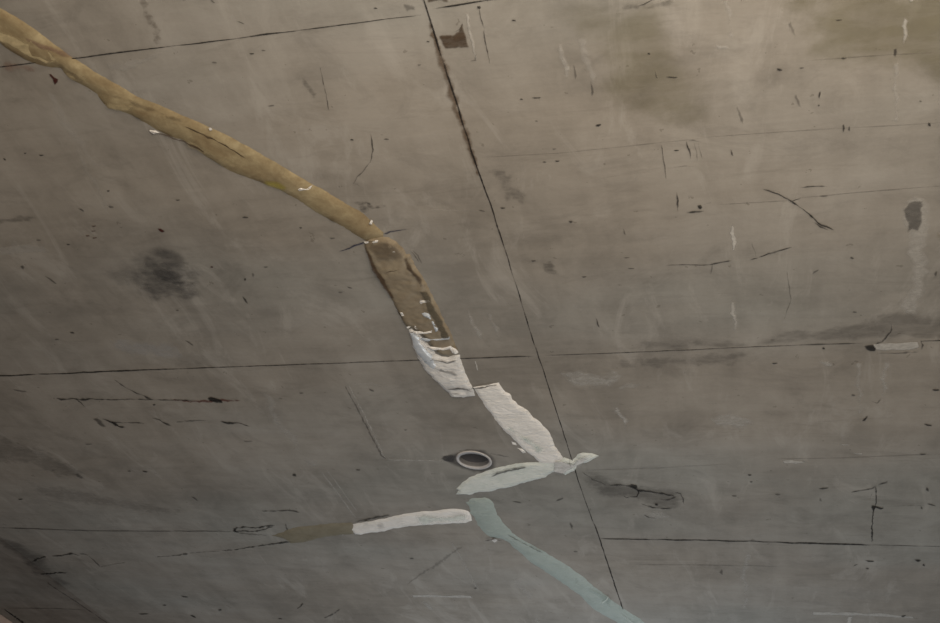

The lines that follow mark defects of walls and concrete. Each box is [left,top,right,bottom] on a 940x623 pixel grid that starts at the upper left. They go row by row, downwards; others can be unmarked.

crack [0,8,458,356]
crack [767,186,831,229]
crack [59,383,169,428]
crack [177,397,247,426]
crack [224,510,354,551]
crack [611,484,684,517]
crack [854,483,884,537]